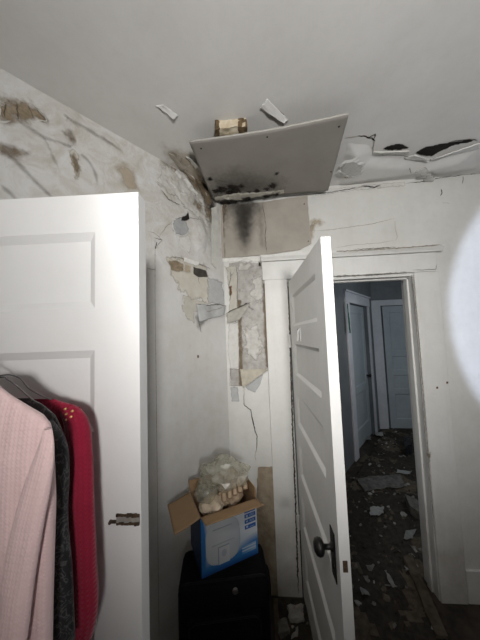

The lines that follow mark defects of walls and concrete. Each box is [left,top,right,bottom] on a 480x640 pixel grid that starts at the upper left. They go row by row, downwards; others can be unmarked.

spalling [157,153,268,401]
leakage [171,153,279,230]